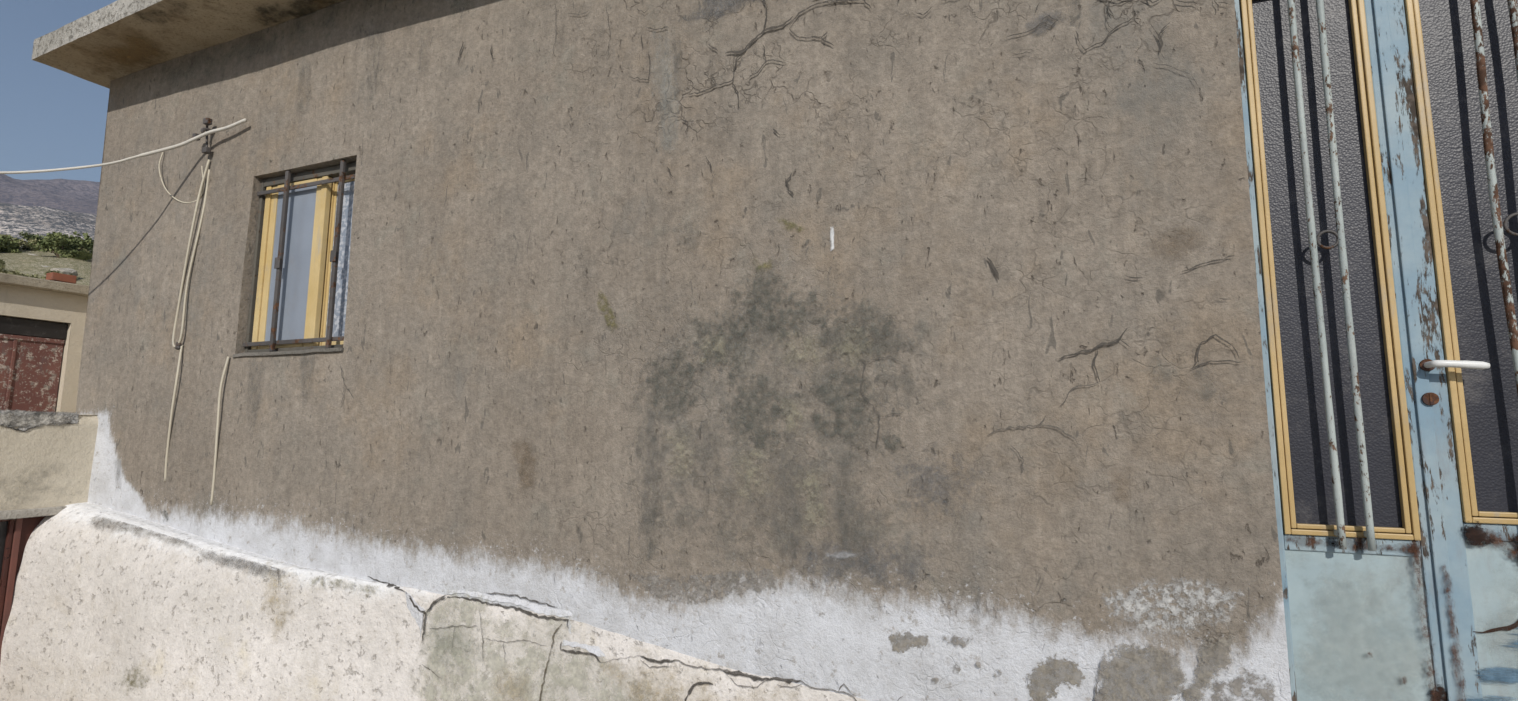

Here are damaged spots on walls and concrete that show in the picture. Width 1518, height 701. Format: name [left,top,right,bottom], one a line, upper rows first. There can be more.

crack [552,5,667,80]
crack [681,0,944,170]
crack [1005,0,1230,84]
water stain [647,275,891,495]
crack [987,328,1131,473]
crack [424,612,562,701]
crack [602,655,857,701]
peeling [1023,628,1275,701]